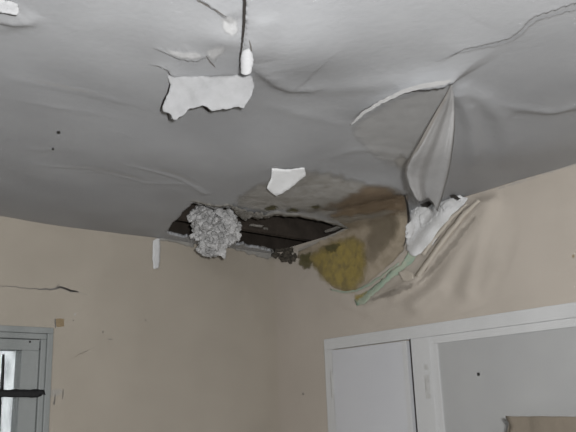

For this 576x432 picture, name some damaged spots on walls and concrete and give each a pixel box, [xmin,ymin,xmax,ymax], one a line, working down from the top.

peeling [0,0,20,16]
peeling [222,17,238,36]
peeling [167,47,225,67]
peeling [160,72,254,120]
flaking render [354,88,447,171]
spalling [191,168,379,229]
peeling [152,238,194,269]
water stain [299,237,365,291]
crack [2,284,89,296]